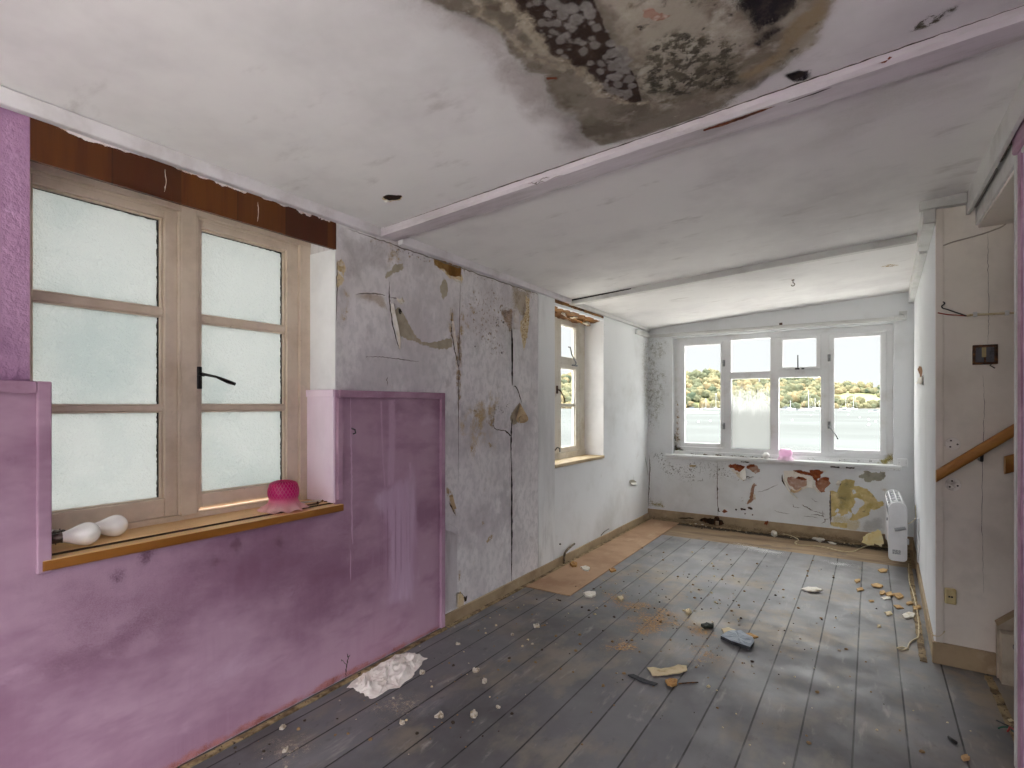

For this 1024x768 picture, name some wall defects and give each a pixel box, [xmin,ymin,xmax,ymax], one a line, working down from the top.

damp [381,0,841,157]
peeling [59,127,146,158]
peeling [164,167,247,194]
peeling [433,259,463,300]
peeling [389,283,452,350]
damp [640,338,763,482]
flaking render [722,461,760,515]
flaking render [782,466,895,531]